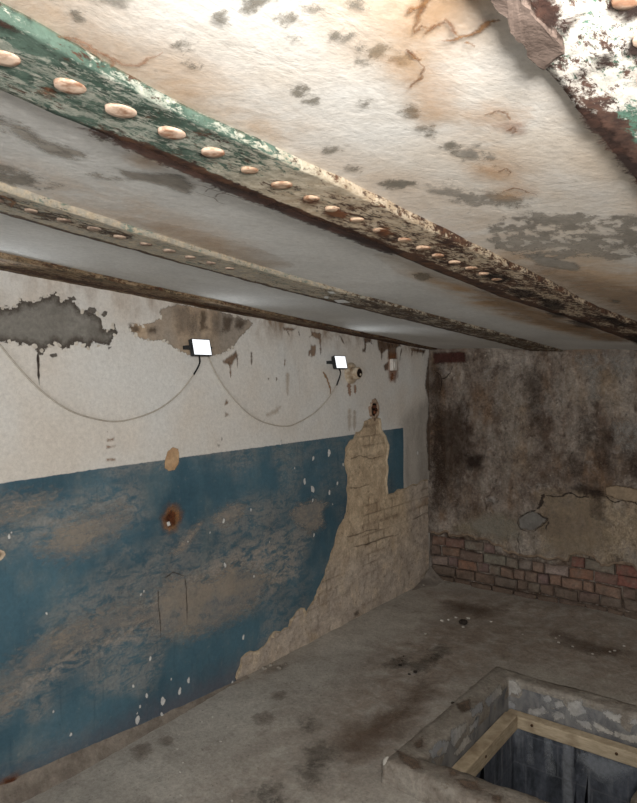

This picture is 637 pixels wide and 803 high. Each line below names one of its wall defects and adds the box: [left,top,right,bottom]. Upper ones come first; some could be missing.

water stain [213,9,228,23]
water stain [243,0,267,14]
water stain [356,44,412,65]
water stain [290,85,320,105]
peeling [428,184,637,271]
peeling [0,292,118,380]
peeling [130,304,253,358]
water stain [484,273,637,344]
flaking render [165,447,179,471]
rust [164,505,180,529]
flaking render [232,403,637,683]
crack [517,492,637,555]